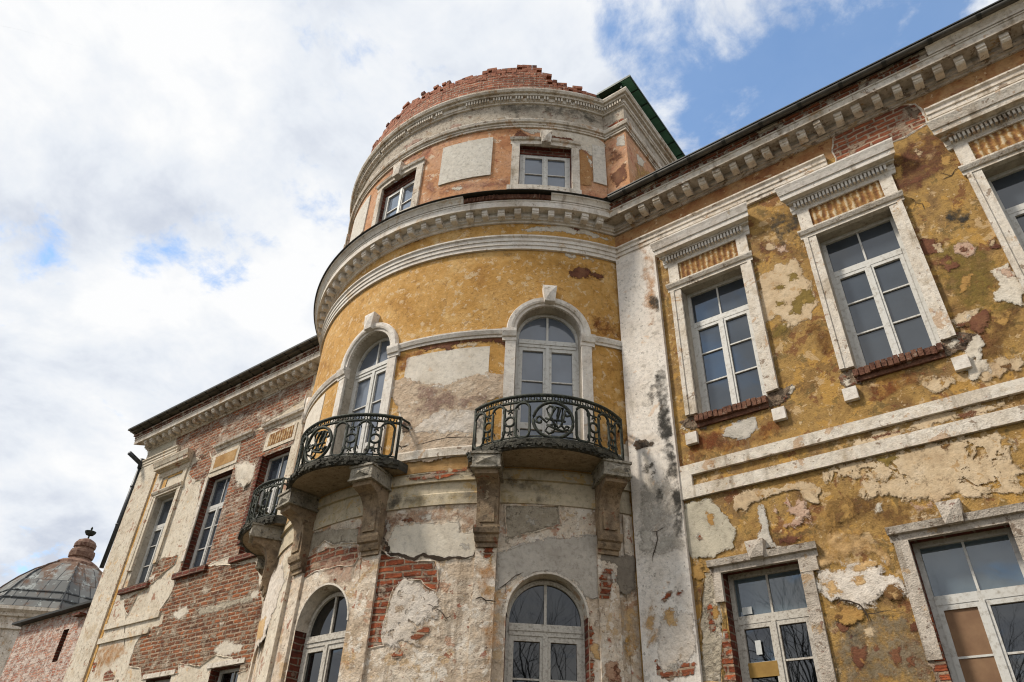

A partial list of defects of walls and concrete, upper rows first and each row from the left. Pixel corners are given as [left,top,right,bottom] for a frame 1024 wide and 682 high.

spalling [831,104,953,191]
peeling [756,242,819,337]
peeling [920,237,1024,382]
peeling [391,372,504,480]
water stain [650,374,677,477]
spalling [124,375,363,681]
spalling [367,503,562,659]
water stain [658,489,682,535]
peeling [570,430,1024,682]